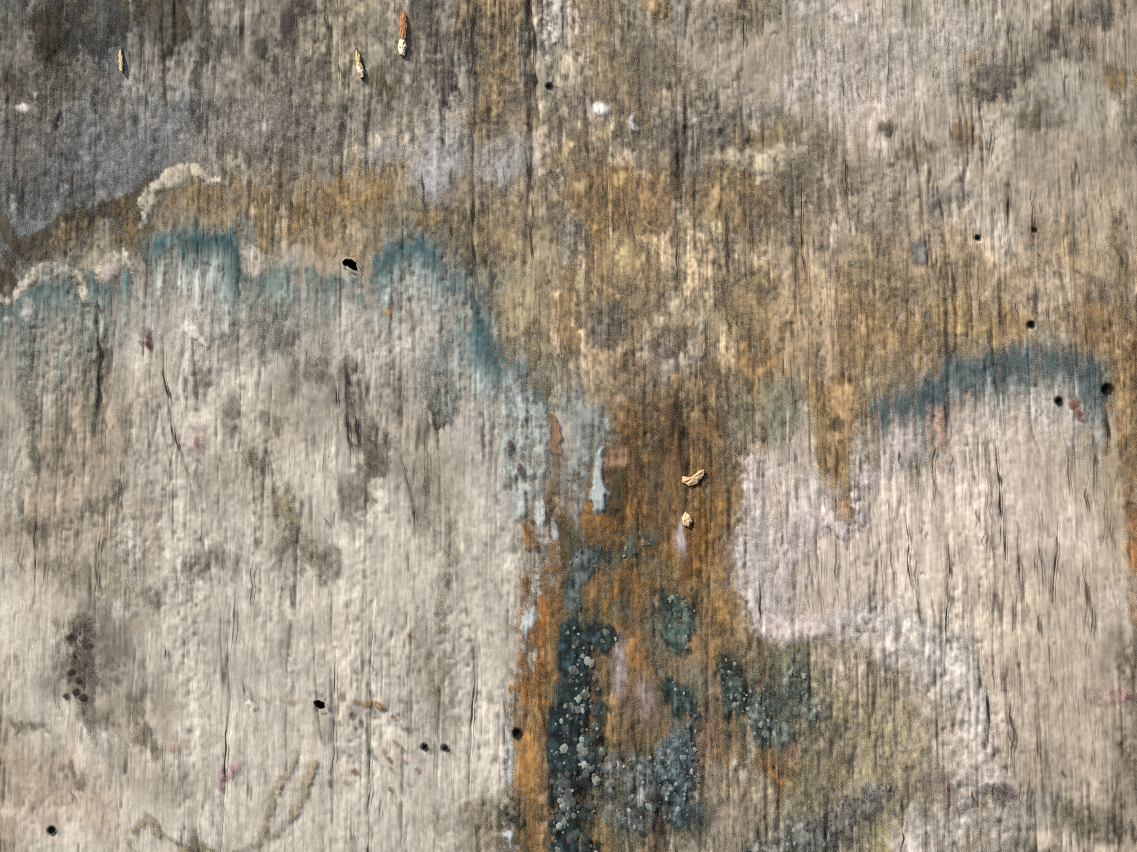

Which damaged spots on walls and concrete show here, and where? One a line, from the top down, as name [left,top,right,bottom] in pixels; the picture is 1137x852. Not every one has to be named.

rust [1106,325,1137,624]
rust [497,420,799,852]
water stain [546,533,1013,852]